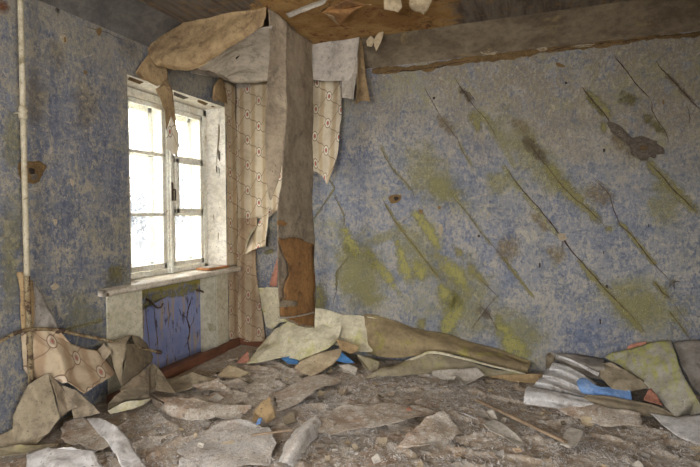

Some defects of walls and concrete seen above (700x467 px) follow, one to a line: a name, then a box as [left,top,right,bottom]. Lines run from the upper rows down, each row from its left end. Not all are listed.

flaking render [17,161,47,184]
crack [422,83,473,167]
crack [451,80,698,340]
spalling [607,121,665,161]
crack [615,57,668,137]
crack [657,63,700,123]
damp [337,228,442,304]
crack [179,297,194,352]